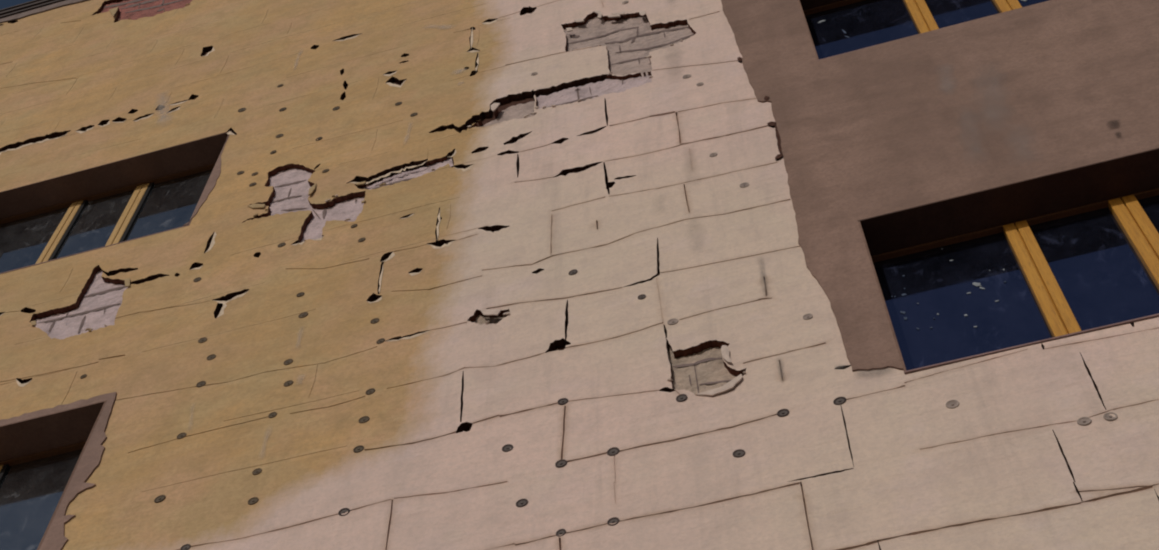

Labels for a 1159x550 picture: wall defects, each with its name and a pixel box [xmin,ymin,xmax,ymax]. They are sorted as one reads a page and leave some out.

spalling [92,0,192,23]
crack [383,53,409,88]
crack [464,6,537,76]
spalling [467,10,696,128]
crack [0,94,199,155]
crack [346,74,636,194]
spalling [242,156,453,243]
spalling [21,265,180,339]
spalling [659,325,746,396]